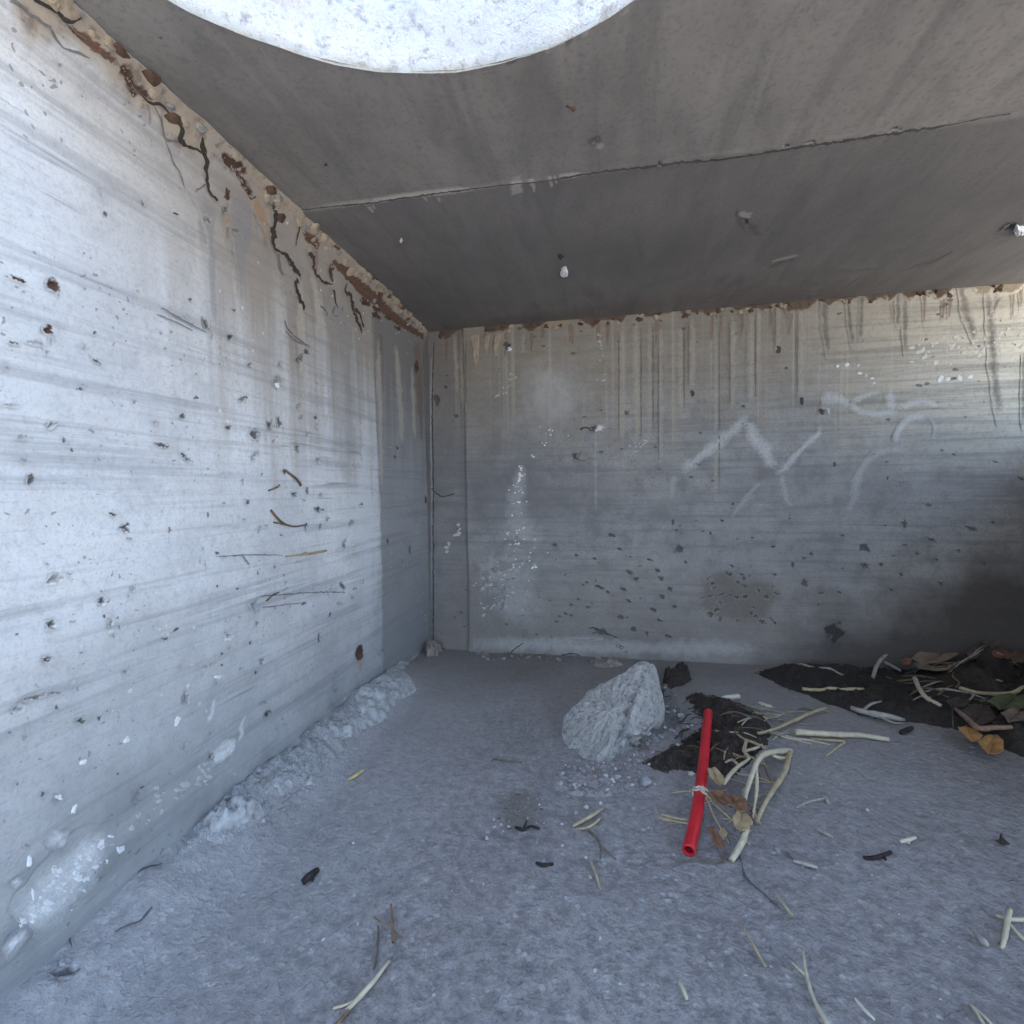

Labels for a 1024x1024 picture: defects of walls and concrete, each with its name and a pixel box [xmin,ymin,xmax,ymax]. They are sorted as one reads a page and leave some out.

crack [9,0,90,59]
crack [130,85,218,202]
corrosion [222,186,233,244]
corrosion [248,192,271,253]
water stain [596,316,698,480]
corrosion [434,253,963,366]
water stain [712,307,783,516]
water stain [894,288,1024,432]
corrosion [973,283,1024,320]
water stain [470,455,795,662]
water stain [129,715,246,831]
water stain [0,820,125,966]